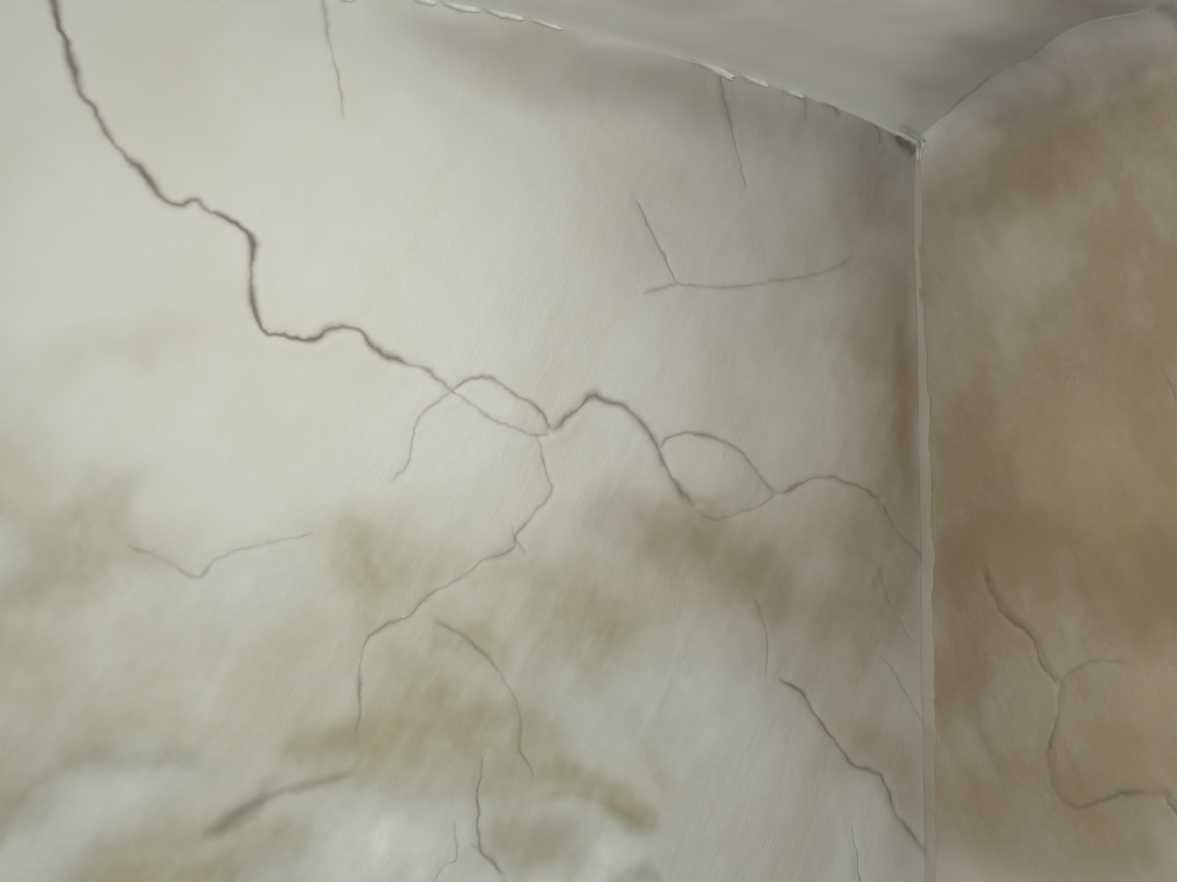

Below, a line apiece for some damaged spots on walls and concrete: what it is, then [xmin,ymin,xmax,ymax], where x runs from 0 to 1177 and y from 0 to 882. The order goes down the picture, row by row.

crack [51,0,429,370]
crack [896,136,914,153]
crack [537,394,663,461]
leakage [931,167,1177,851]
crack [787,683,891,800]
leakage [270,800,663,882]